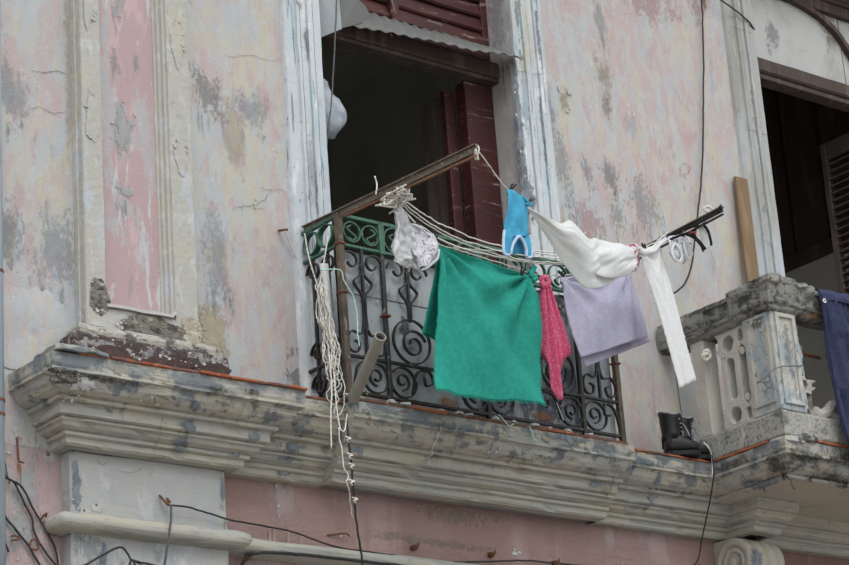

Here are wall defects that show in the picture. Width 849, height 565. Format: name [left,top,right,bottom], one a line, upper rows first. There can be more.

spalling [90,277,111,316]
peeling [92,345,232,375]
spalling [42,367,106,403]